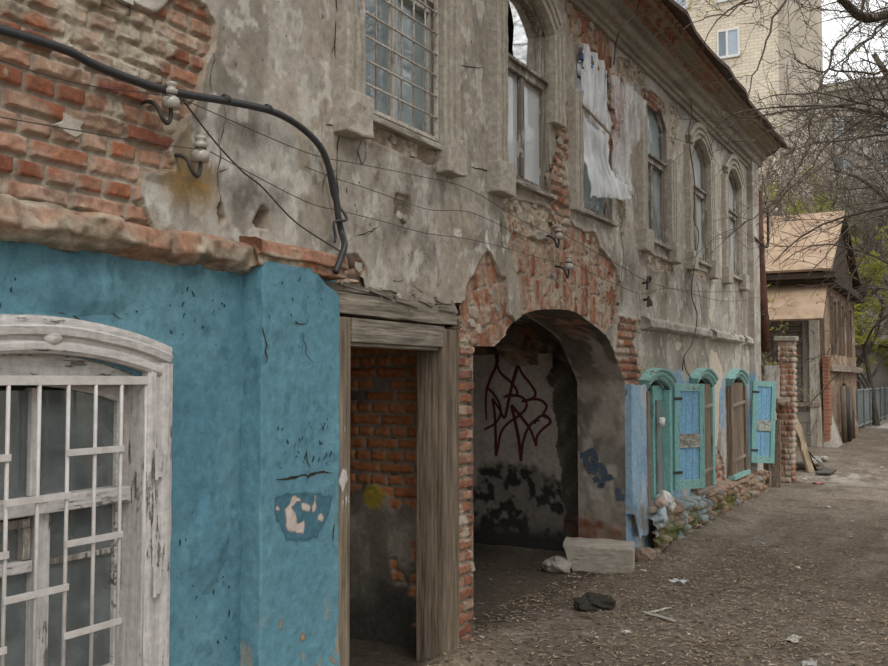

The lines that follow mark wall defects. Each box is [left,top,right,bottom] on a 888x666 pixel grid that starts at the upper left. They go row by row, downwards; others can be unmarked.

flaking render [0,0,211,227]
spalling [393,194,410,226]
flaking render [371,124,437,165]
flaking render [502,100,641,395]
flaking render [565,0,676,154]
peeling [275,493,332,541]
crack [276,443,334,480]
flaking render [334,229,512,643]